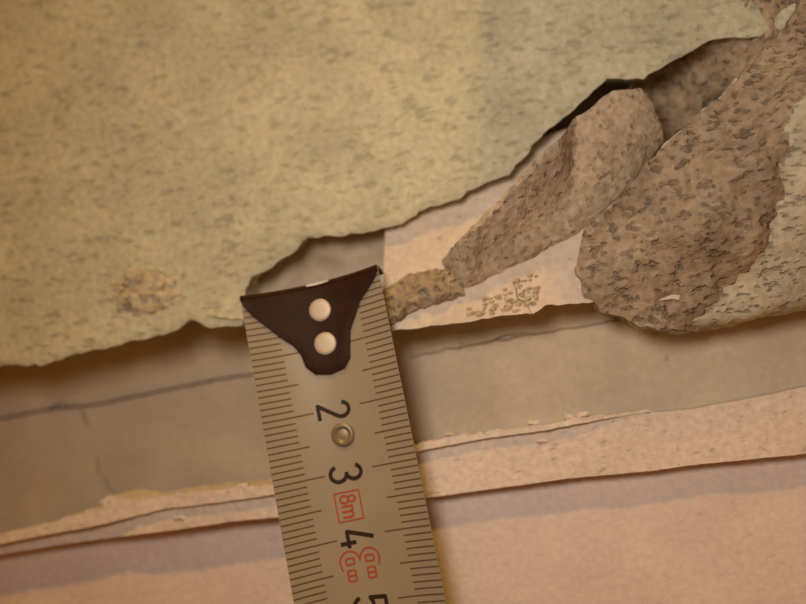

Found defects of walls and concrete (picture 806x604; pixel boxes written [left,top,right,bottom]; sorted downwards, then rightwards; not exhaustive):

spalling [627,0,796,151]
crack [0,374,254,426]